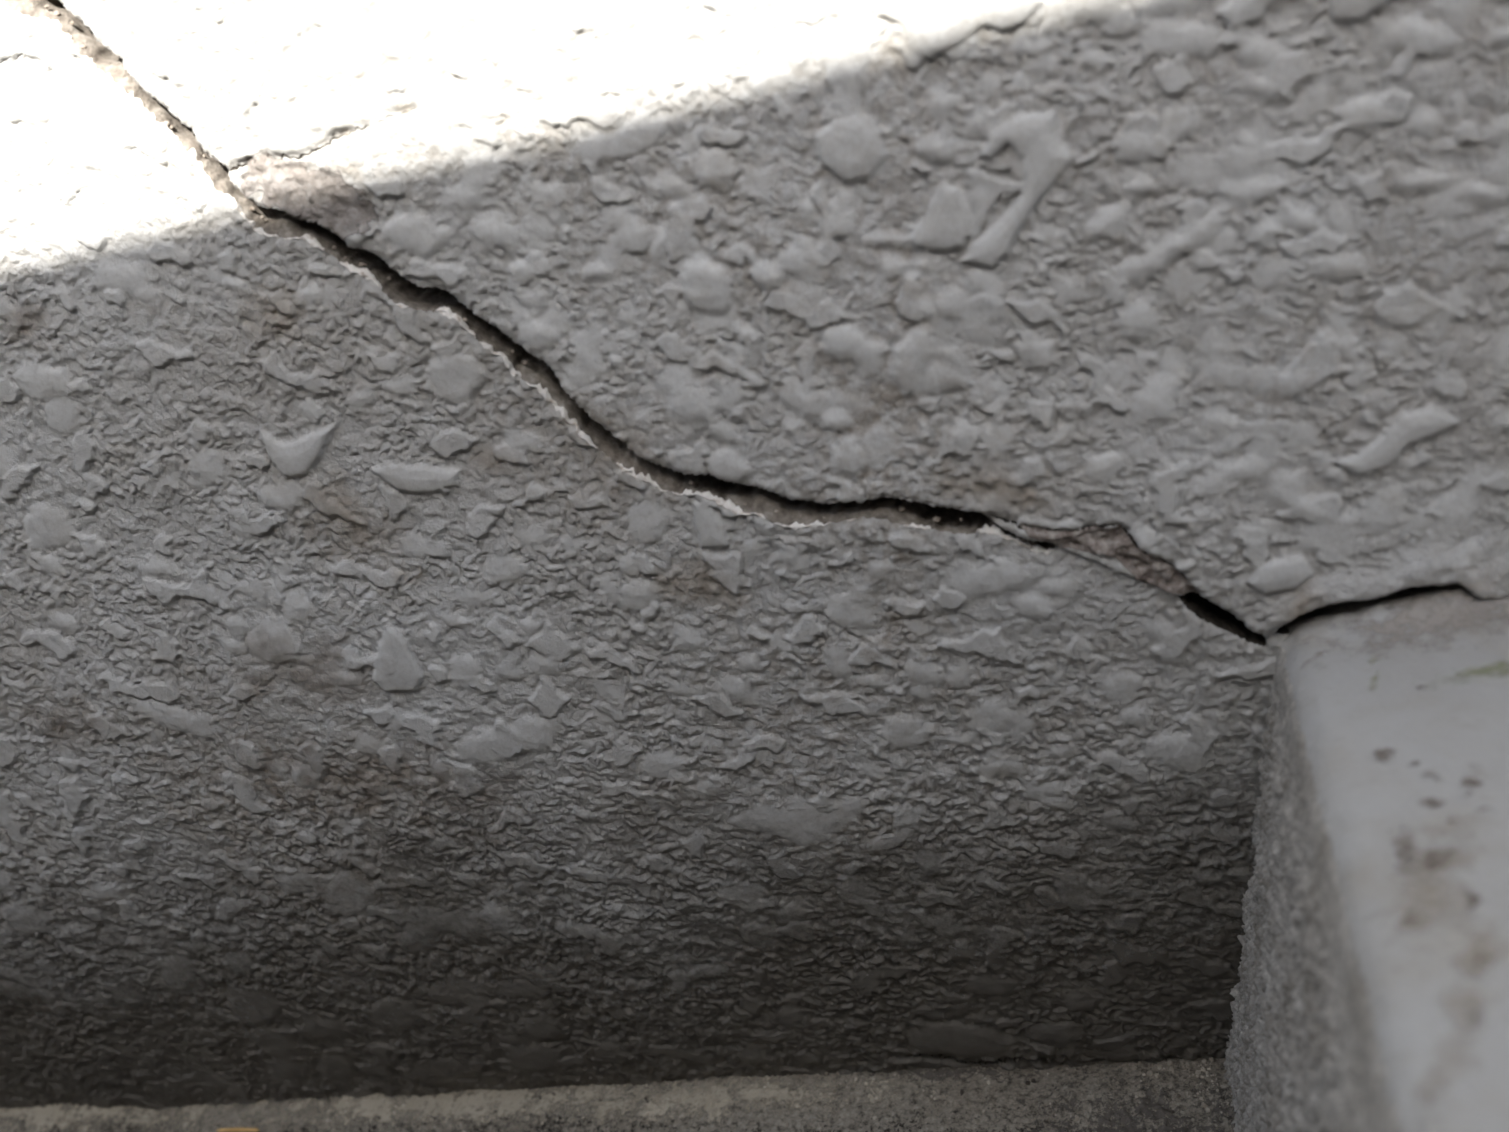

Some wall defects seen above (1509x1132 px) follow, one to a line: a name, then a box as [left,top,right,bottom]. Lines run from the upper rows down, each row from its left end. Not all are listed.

crack [0,0,1290,647]